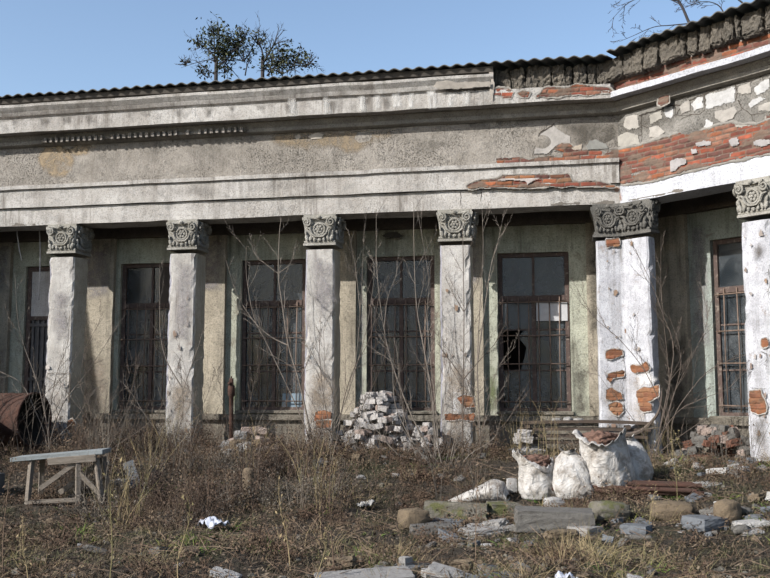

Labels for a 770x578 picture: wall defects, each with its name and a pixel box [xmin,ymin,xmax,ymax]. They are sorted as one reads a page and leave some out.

spalling [433,32,770,100]
spalling [466,79,770,204]
spalling [605,237,633,254]
spalling [605,328,626,360]
peeling [313,373,332,429]
spalling [444,367,476,421]
spalling [605,361,651,427]
spalling [636,384,660,413]
spalling [748,389,770,436]